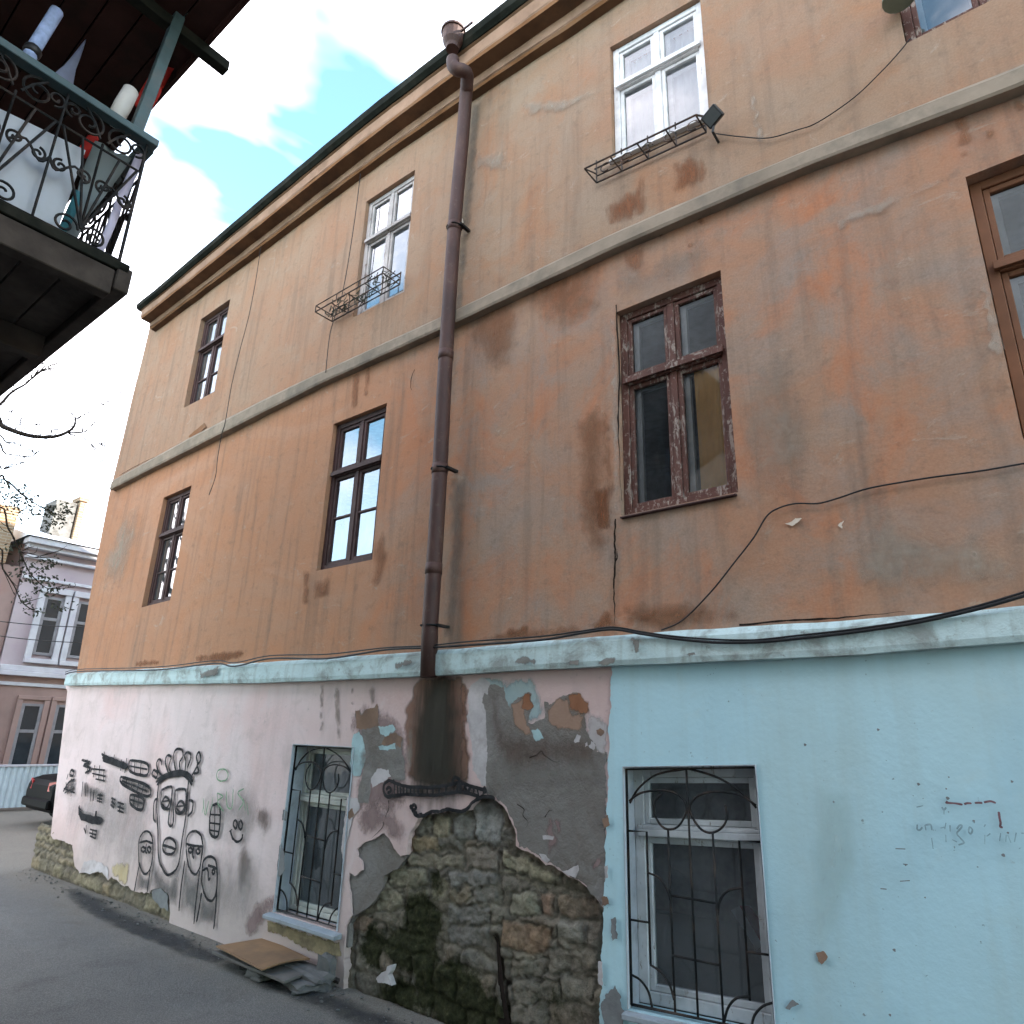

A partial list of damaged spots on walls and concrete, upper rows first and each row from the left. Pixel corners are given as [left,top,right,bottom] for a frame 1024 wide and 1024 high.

flaking render [267,677,624,1024]